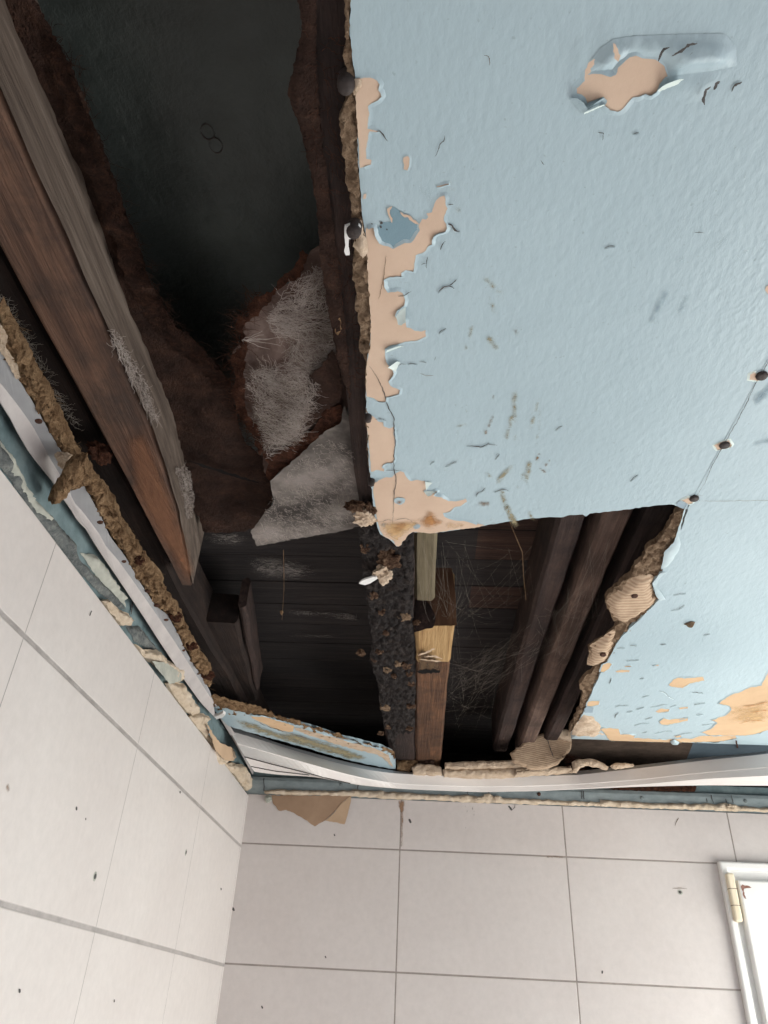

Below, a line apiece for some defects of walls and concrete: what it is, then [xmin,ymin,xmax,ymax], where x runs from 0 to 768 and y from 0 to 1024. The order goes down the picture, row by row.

peeling [569,52,684,116]
peeling [339,0,484,546]
crack [370,367,414,524]
spalling [569,496,694,732]
peeling [600,670,768,748]